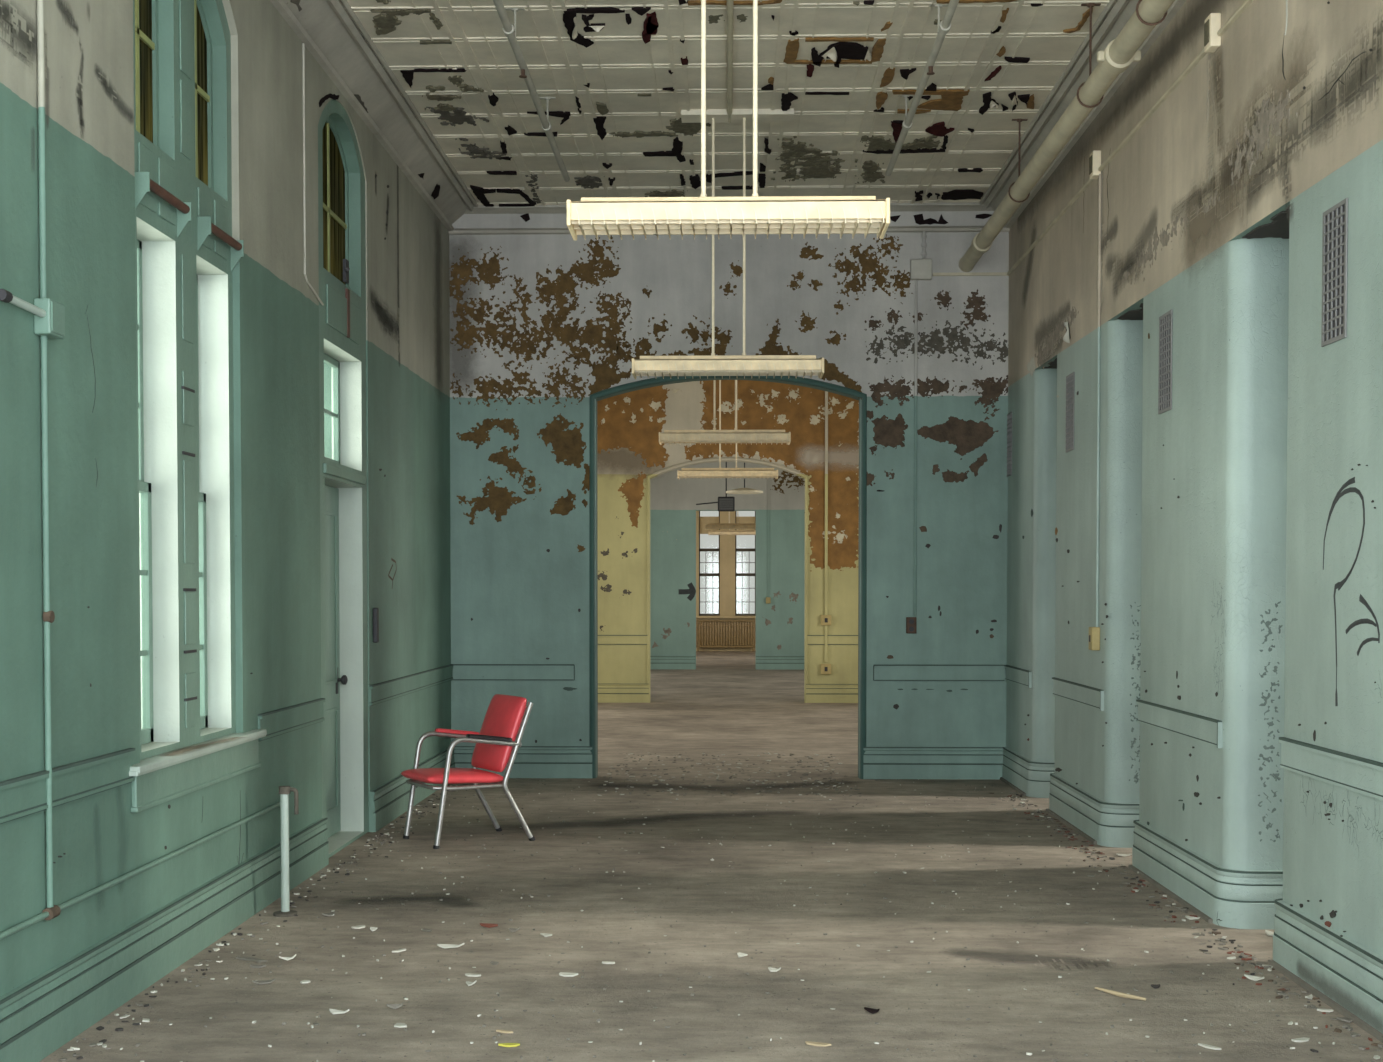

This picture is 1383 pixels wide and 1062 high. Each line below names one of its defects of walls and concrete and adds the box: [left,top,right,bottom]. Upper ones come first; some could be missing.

peeling [319,93,368,113]
peeling [370,0,452,45]
peeling [400,0,1043,222]
peeling [1063,8,1093,33]
water stain [1187,53,1305,253]
peeling [449,189,1008,596]